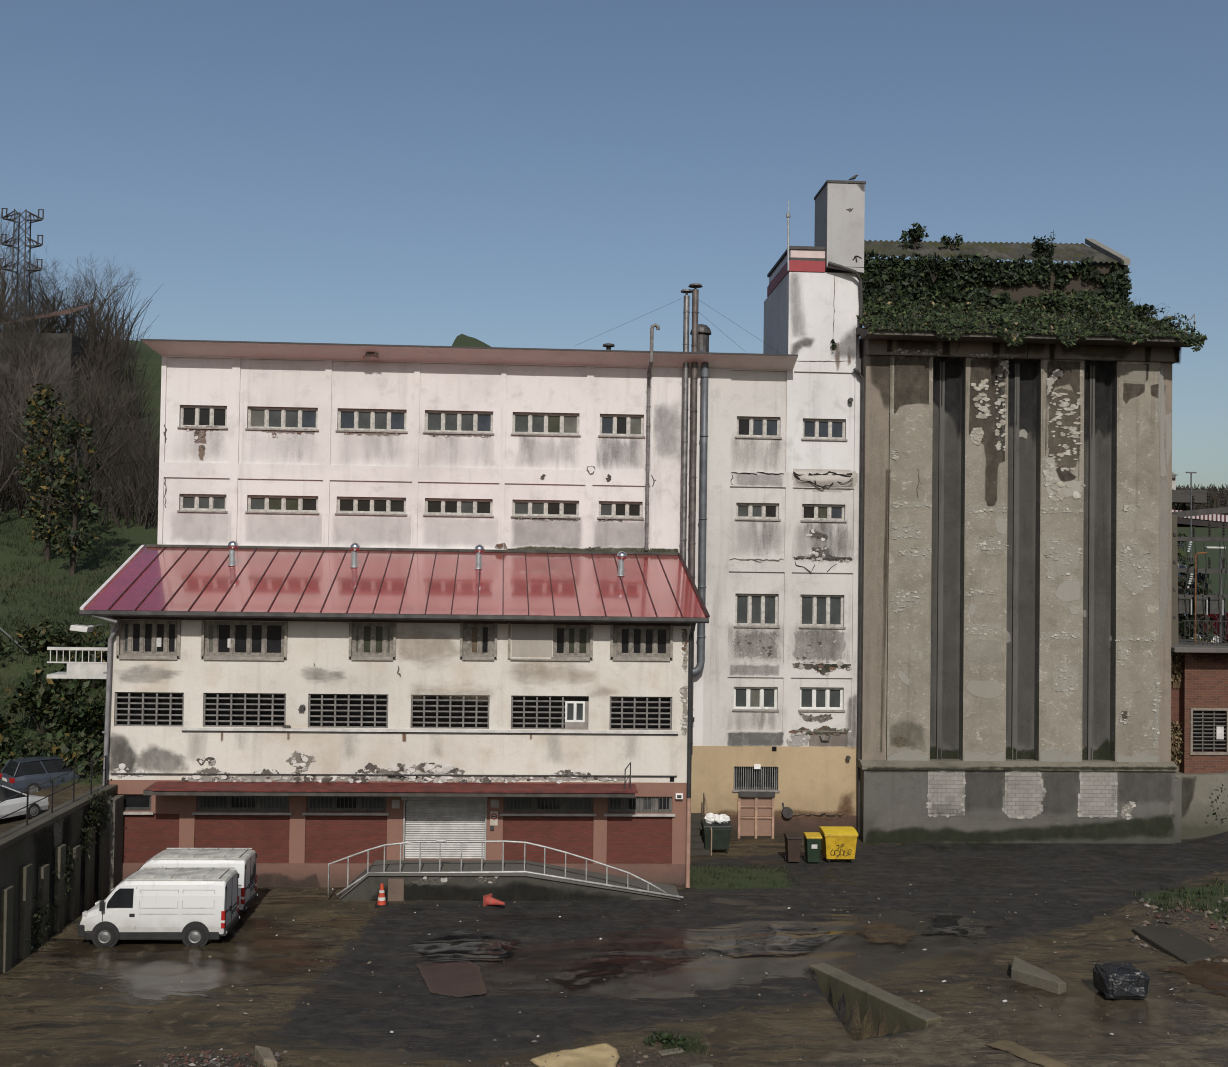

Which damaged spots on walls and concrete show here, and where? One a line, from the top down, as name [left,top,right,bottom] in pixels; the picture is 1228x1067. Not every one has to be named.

damp [792,277,812,354]
flaking render [970,353,1016,451]
flaking render [1042,369,1086,514]
spalling [793,529,852,562]
spalling [793,630,852,676]
spalling [786,713,849,747]
damp [109,737,181,773]
peeling [181,751,624,784]
flaking render [876,770,1058,832]
flaking render [1077,771,1136,820]